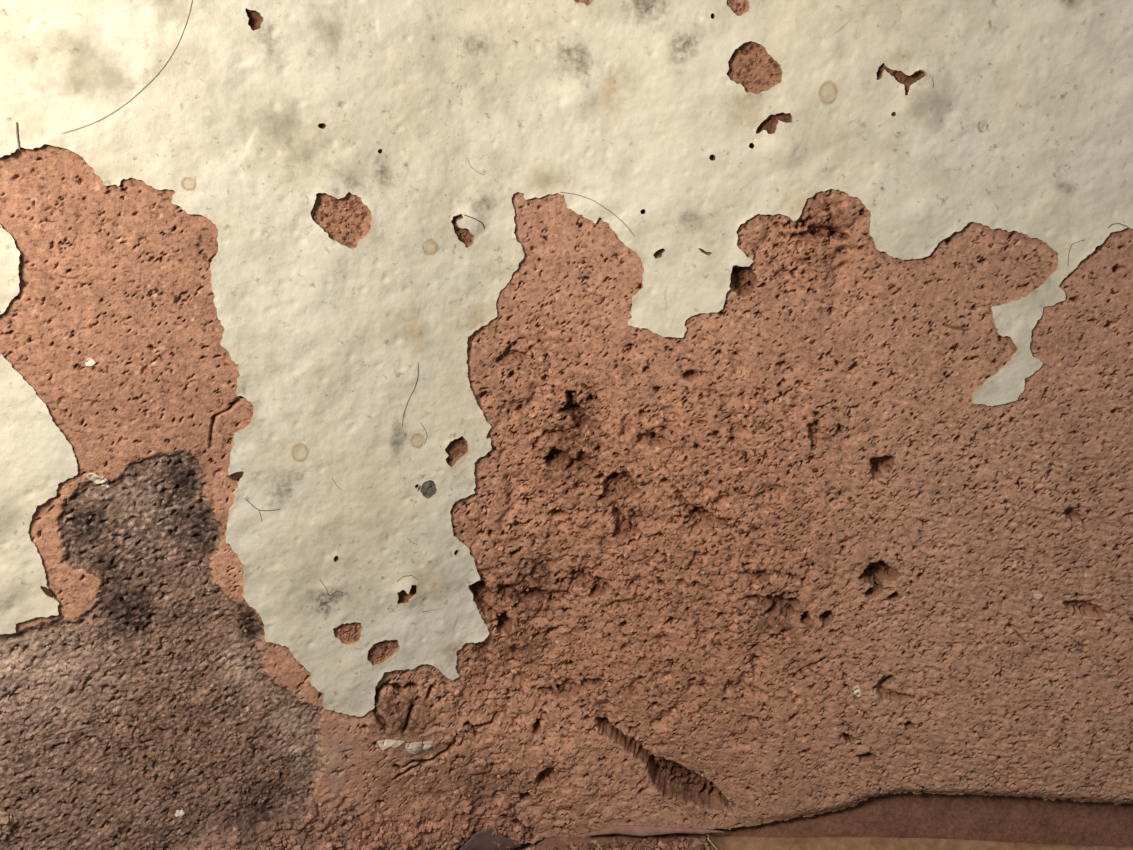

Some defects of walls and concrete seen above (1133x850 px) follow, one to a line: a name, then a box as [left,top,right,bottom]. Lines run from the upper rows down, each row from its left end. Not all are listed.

peeling [566,0,596,11]
peeling [723,0,754,20]
peeling [722,35,787,98]
peeling [750,109,798,139]
water stain [72,508,104,537]
water stain [168,460,197,496]
spalling [0,138,542,850]
peeling [329,185,1133,846]
water stain [105,591,154,633]
water stain [0,635,114,705]
water stain [213,605,264,690]
water stain [269,697,315,754]